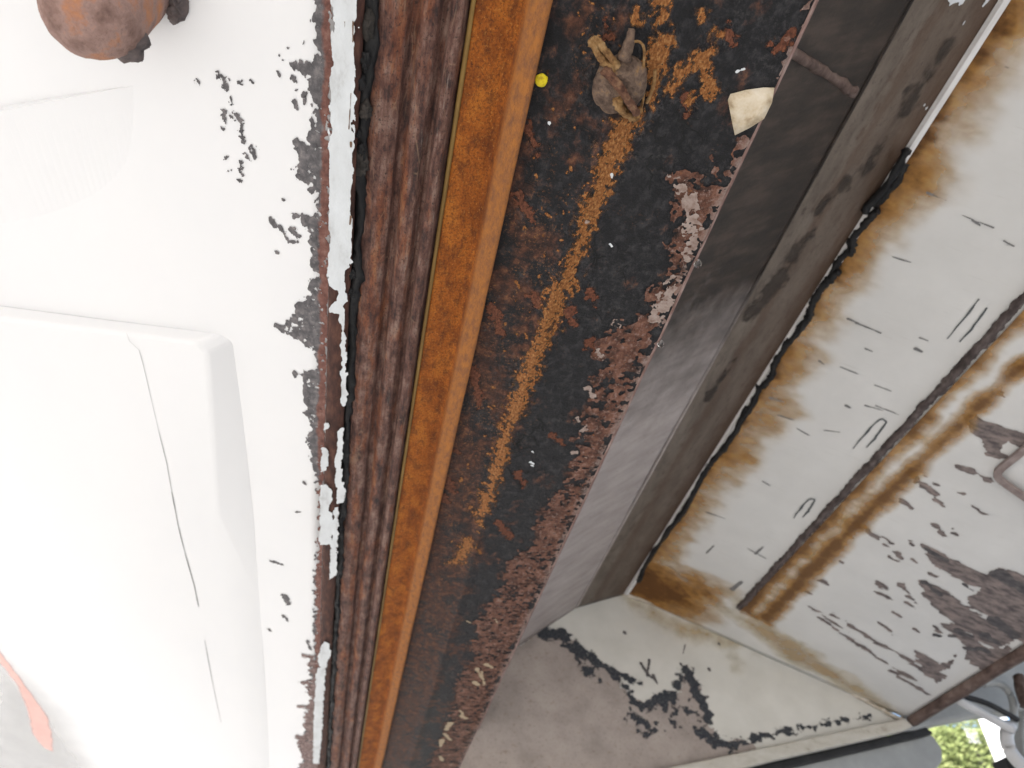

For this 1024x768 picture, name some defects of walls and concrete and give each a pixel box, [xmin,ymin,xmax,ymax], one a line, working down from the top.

peeling [215,70,257,183]
crack [127,335,199,607]
peeling [269,0,359,768]
corrosion [441,0,740,567]
peeling [427,135,872,768]
corrosion [629,0,1024,635]
corrosion [740,310,1024,695]
peeling [805,528,1024,695]
peeling [913,475,945,507]
peeling [930,523,959,537]
peeling [954,464,994,483]
peeling [969,416,1024,459]